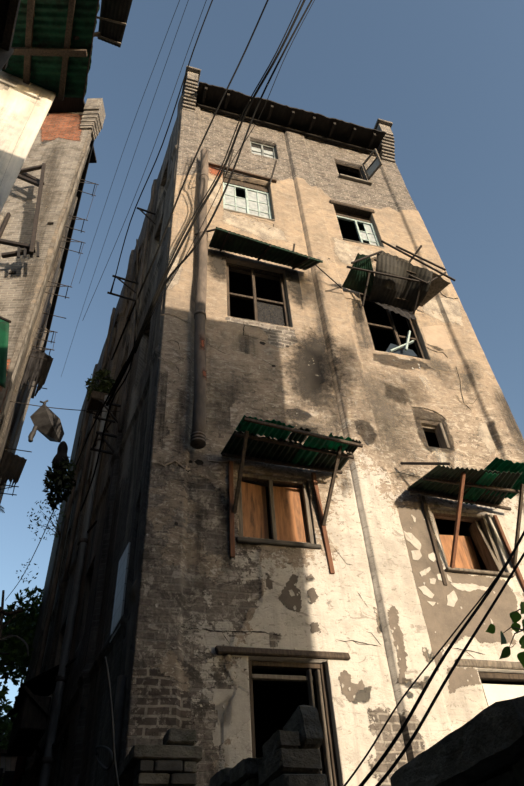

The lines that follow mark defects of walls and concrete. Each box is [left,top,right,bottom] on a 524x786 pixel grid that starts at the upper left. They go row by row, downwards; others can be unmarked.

spalling [207,178,288,242]
crack [425,346,476,411]
peeling [264,572,318,612]
peeling [398,501,524,694]
peeling [373,606,429,690]
peeling [338,670,372,702]
flaking render [367,707,425,786]